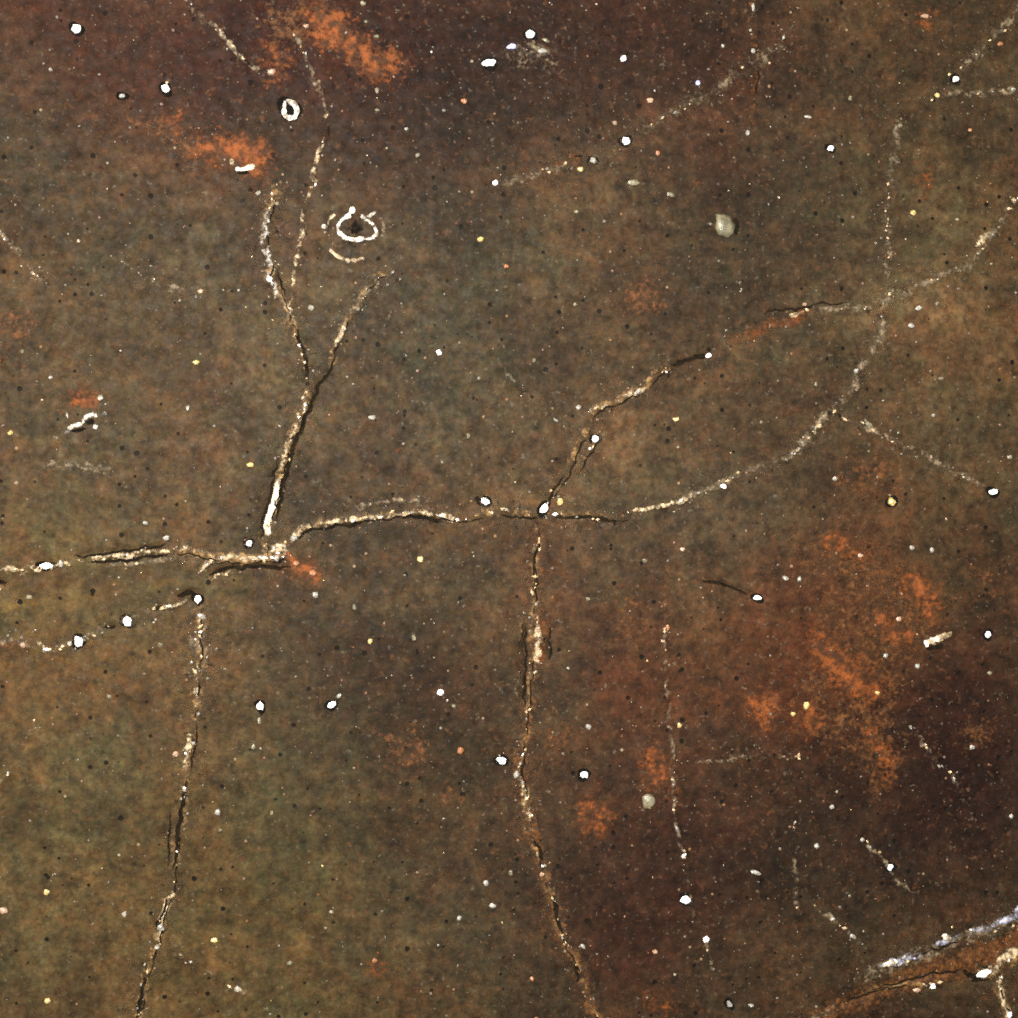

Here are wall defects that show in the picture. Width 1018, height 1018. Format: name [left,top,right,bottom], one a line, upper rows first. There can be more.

crack [293,34,330,197]
rust [256,0,408,89]
crack [500,148,612,188]
crack [643,0,785,132]
crack [0,184,603,1018]
crack [661,566,747,859]
rust [746,526,944,797]
crack [866,840,908,889]
crack [794,902,1018,1018]